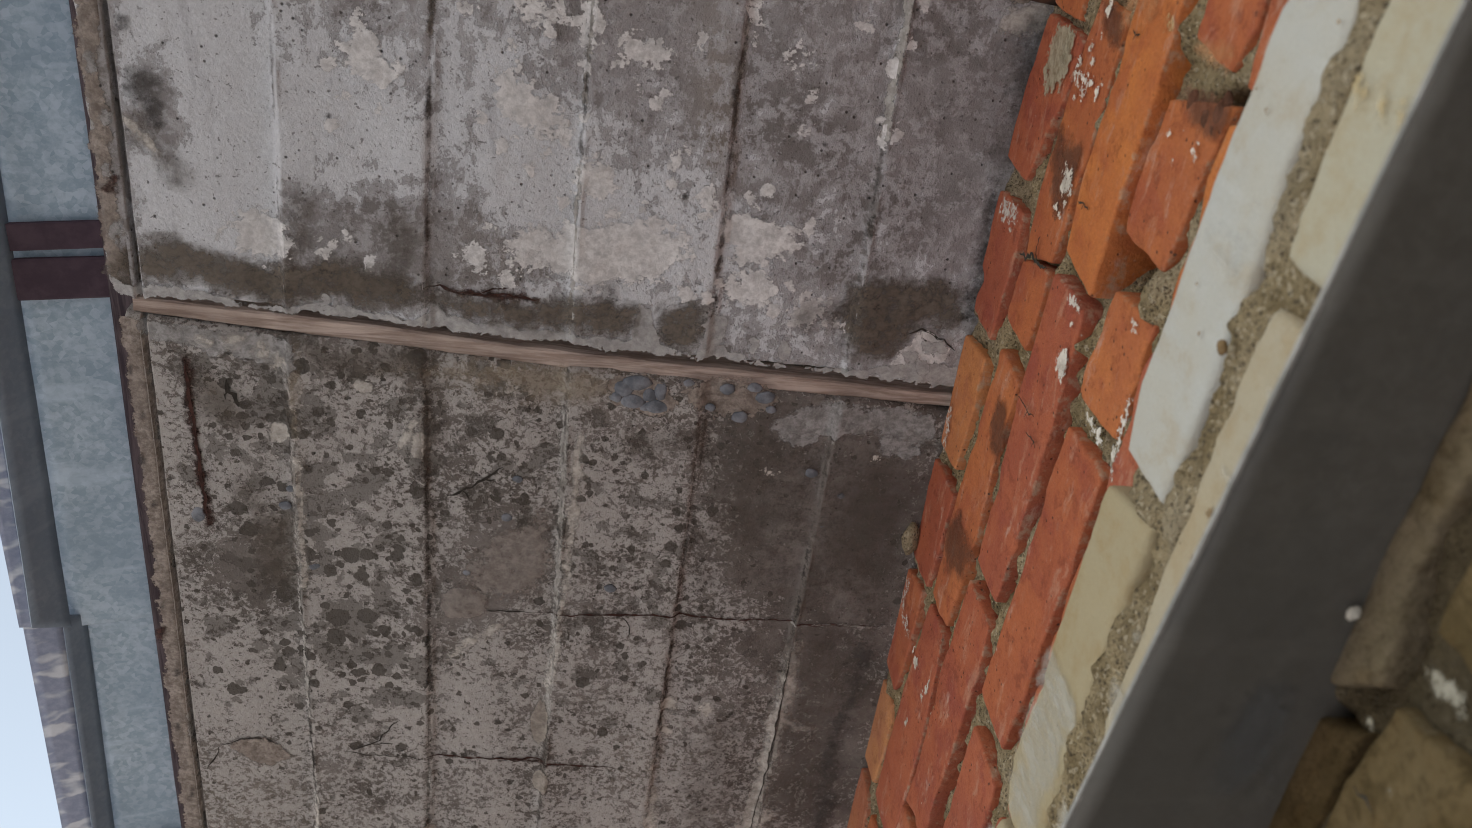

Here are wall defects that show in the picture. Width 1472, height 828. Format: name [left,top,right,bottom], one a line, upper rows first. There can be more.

water stain [124,116,173,165]
water stain [1052,128,1081,220]
water stain [109,221,640,336]
crack [423,284,541,301]
water stain [657,301,712,350]
water stain [836,194,1018,359]
corrosion [182,350,214,525]
crack [486,610,888,638]
water stain [901,576,930,699]
crack [353,721,615,769]
water stain [734,642,810,828]